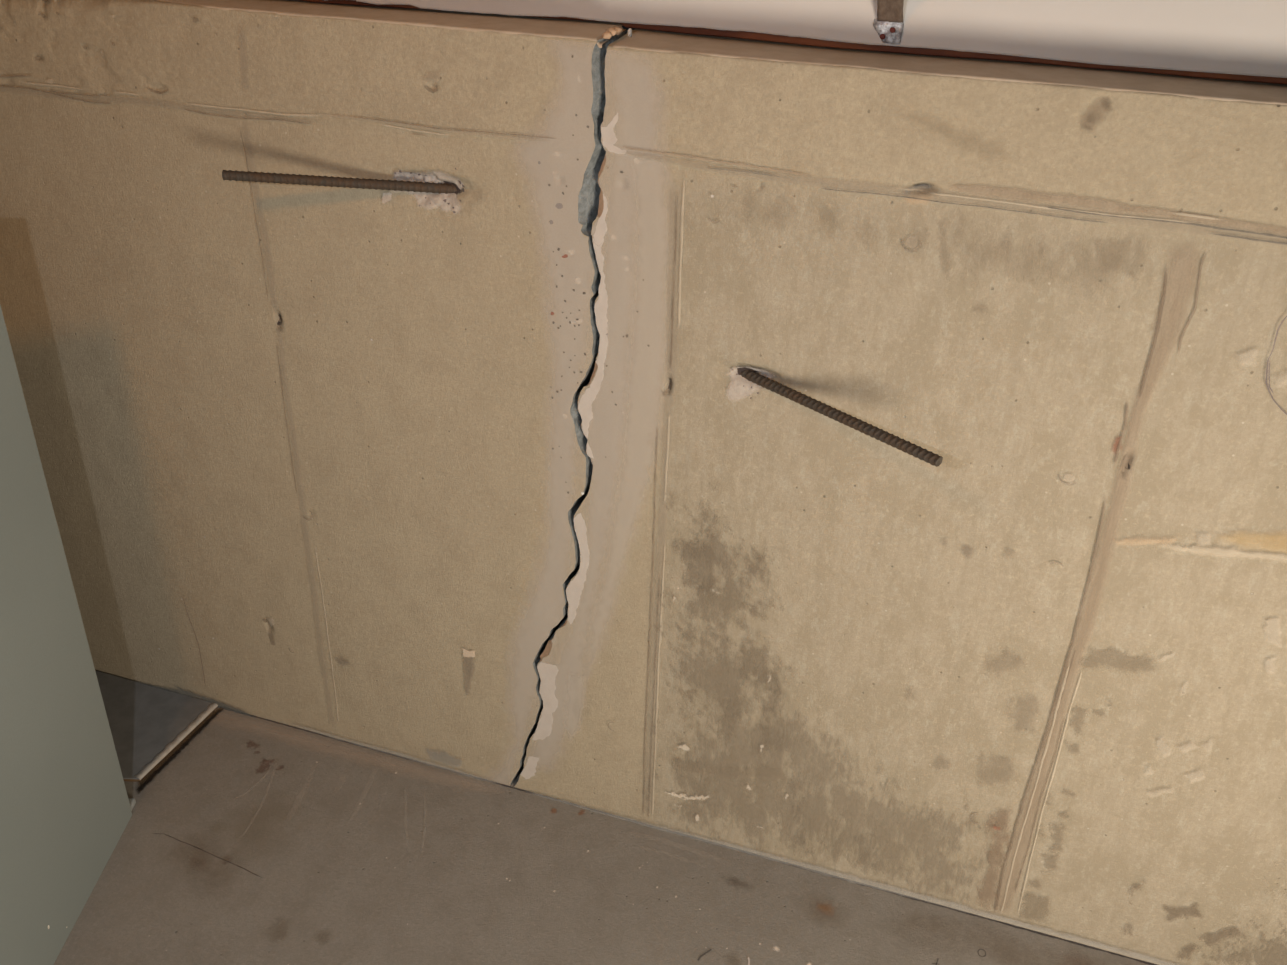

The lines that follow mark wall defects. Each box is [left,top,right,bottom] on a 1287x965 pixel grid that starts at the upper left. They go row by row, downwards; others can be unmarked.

peeling [533,662,559,741]
crack [510,27,636,785]
peeling [566,513,590,624]
damp [644,482,1010,909]